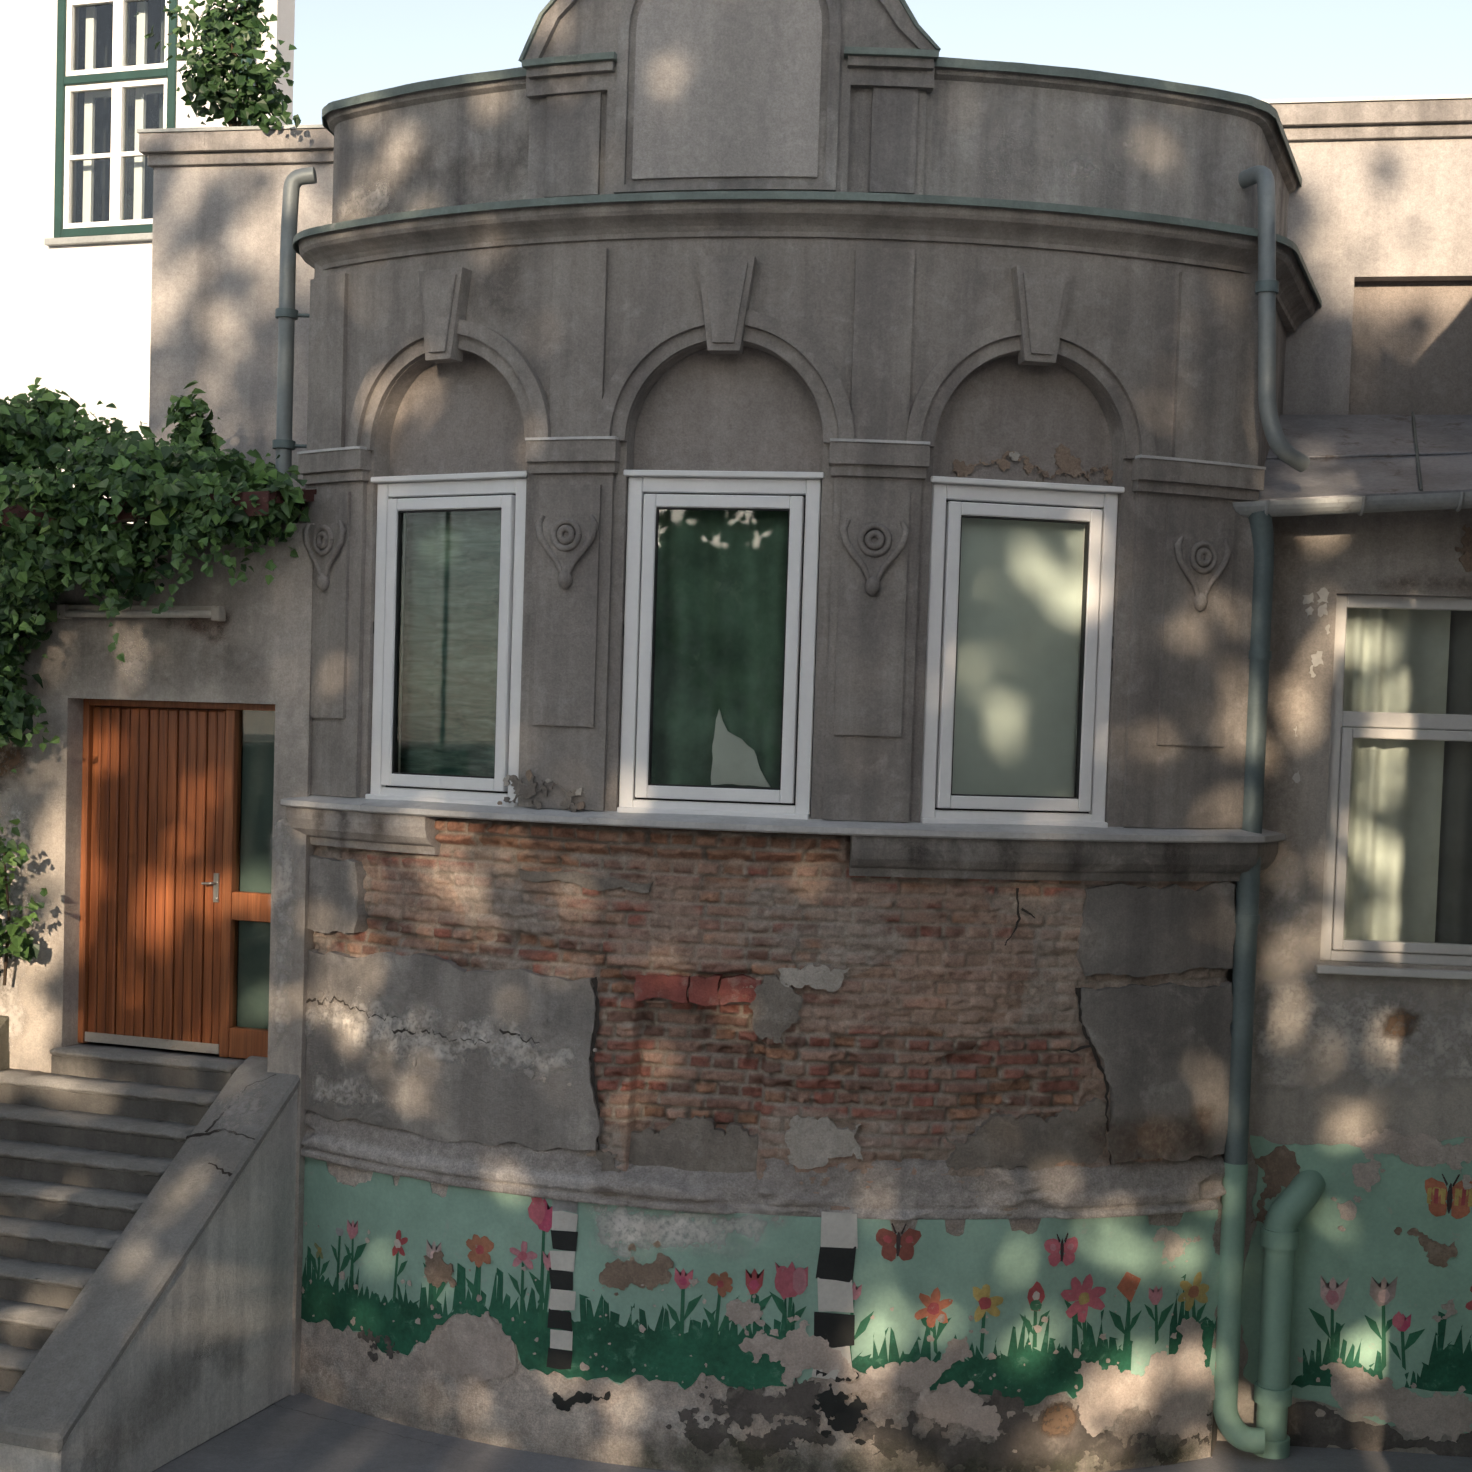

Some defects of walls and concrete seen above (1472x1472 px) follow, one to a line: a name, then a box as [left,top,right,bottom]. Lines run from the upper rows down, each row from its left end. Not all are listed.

spalling [305,769,1231,1211]
crack [186,1074,276,1177]
crack [1060,988,1111,1164]
peeling [1251,1145,1301,1223]
peeling [1331,1129,1472,1232]
peeling [350,1303,400,1362]
peeling [401,1251,538,1388]
peeling [592,1240,706,1307]
peeling [665,1293,1216,1472]
water stain [1287,1401,1472,1457]
peeling [1315,1358,1472,1443]
peeling [1394,1227,1458,1268]